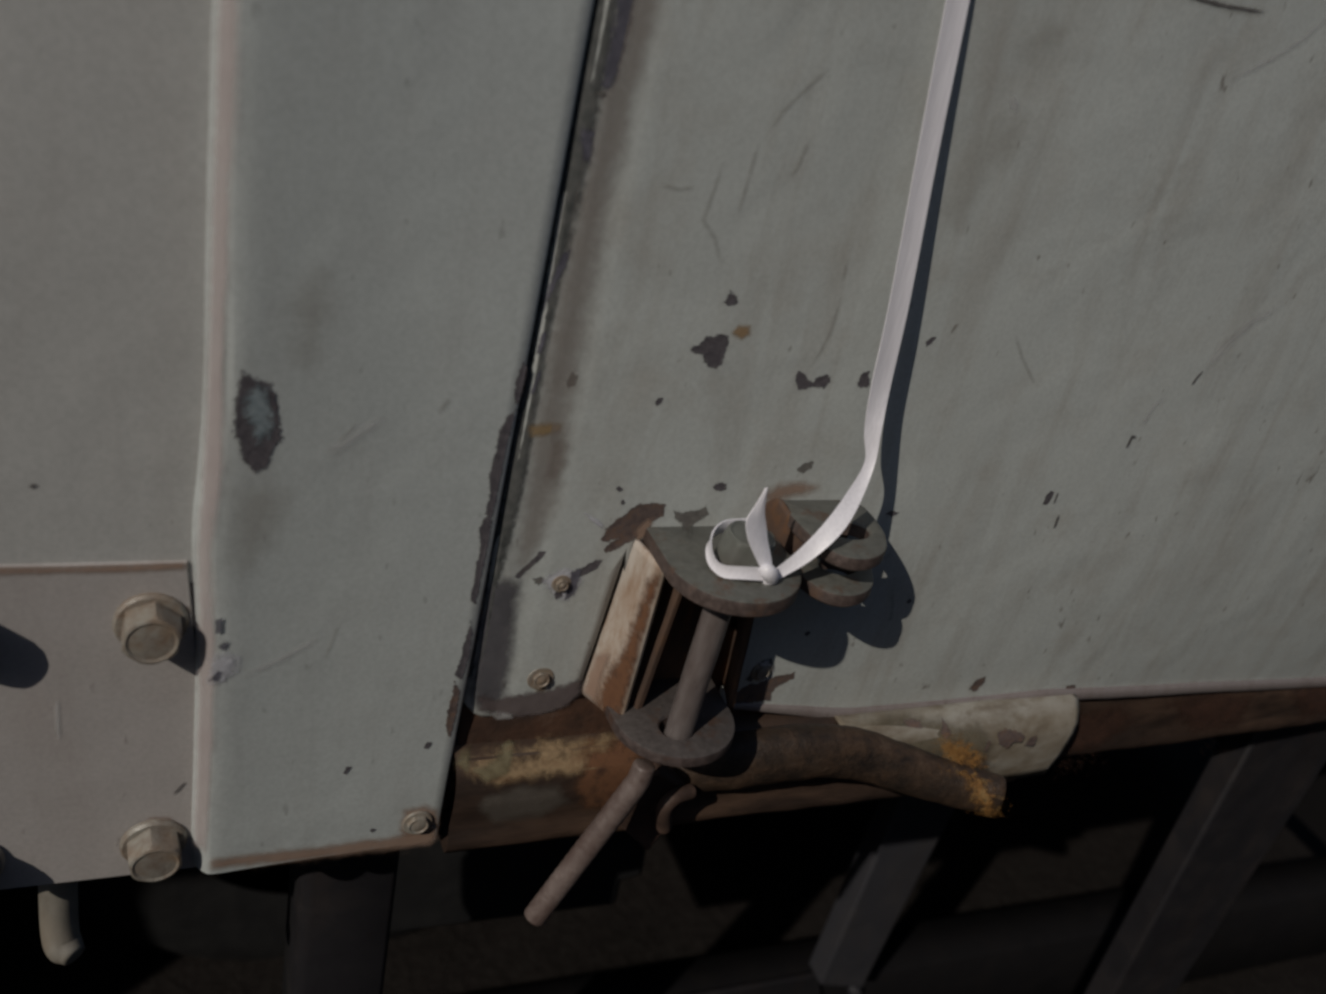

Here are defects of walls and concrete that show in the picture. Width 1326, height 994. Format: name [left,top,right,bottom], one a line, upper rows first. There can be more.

peeling [195,0,284,843]
peeling [470,332,547,604]
peeling [691,334,729,368]
peeling [795,371,831,390]
peeling [515,502,709,600]
peeling [446,622,473,737]
rust [459,734,638,808]